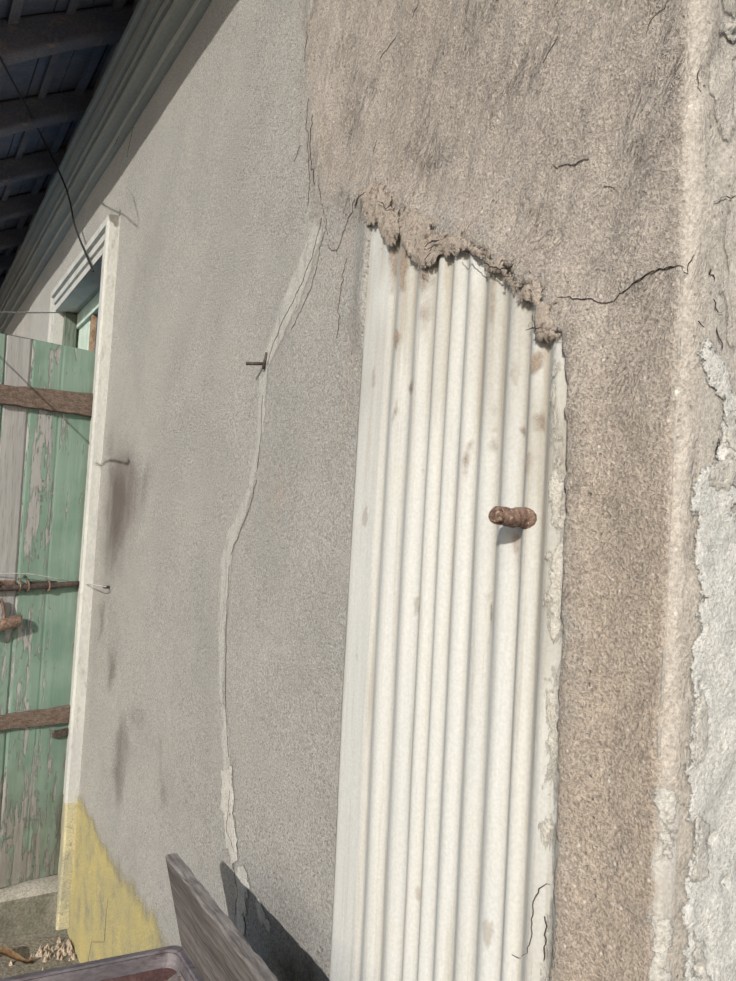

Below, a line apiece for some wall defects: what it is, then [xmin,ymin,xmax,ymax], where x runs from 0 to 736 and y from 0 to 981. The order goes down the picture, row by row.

flaking render [354,180,561,344]
crack [556,255,723,349]
crack [218,98,358,936]
flaking render [541,357,567,644]
peeling [645,336,736,981]
flaking render [538,661,561,874]
crack [512,883,550,961]